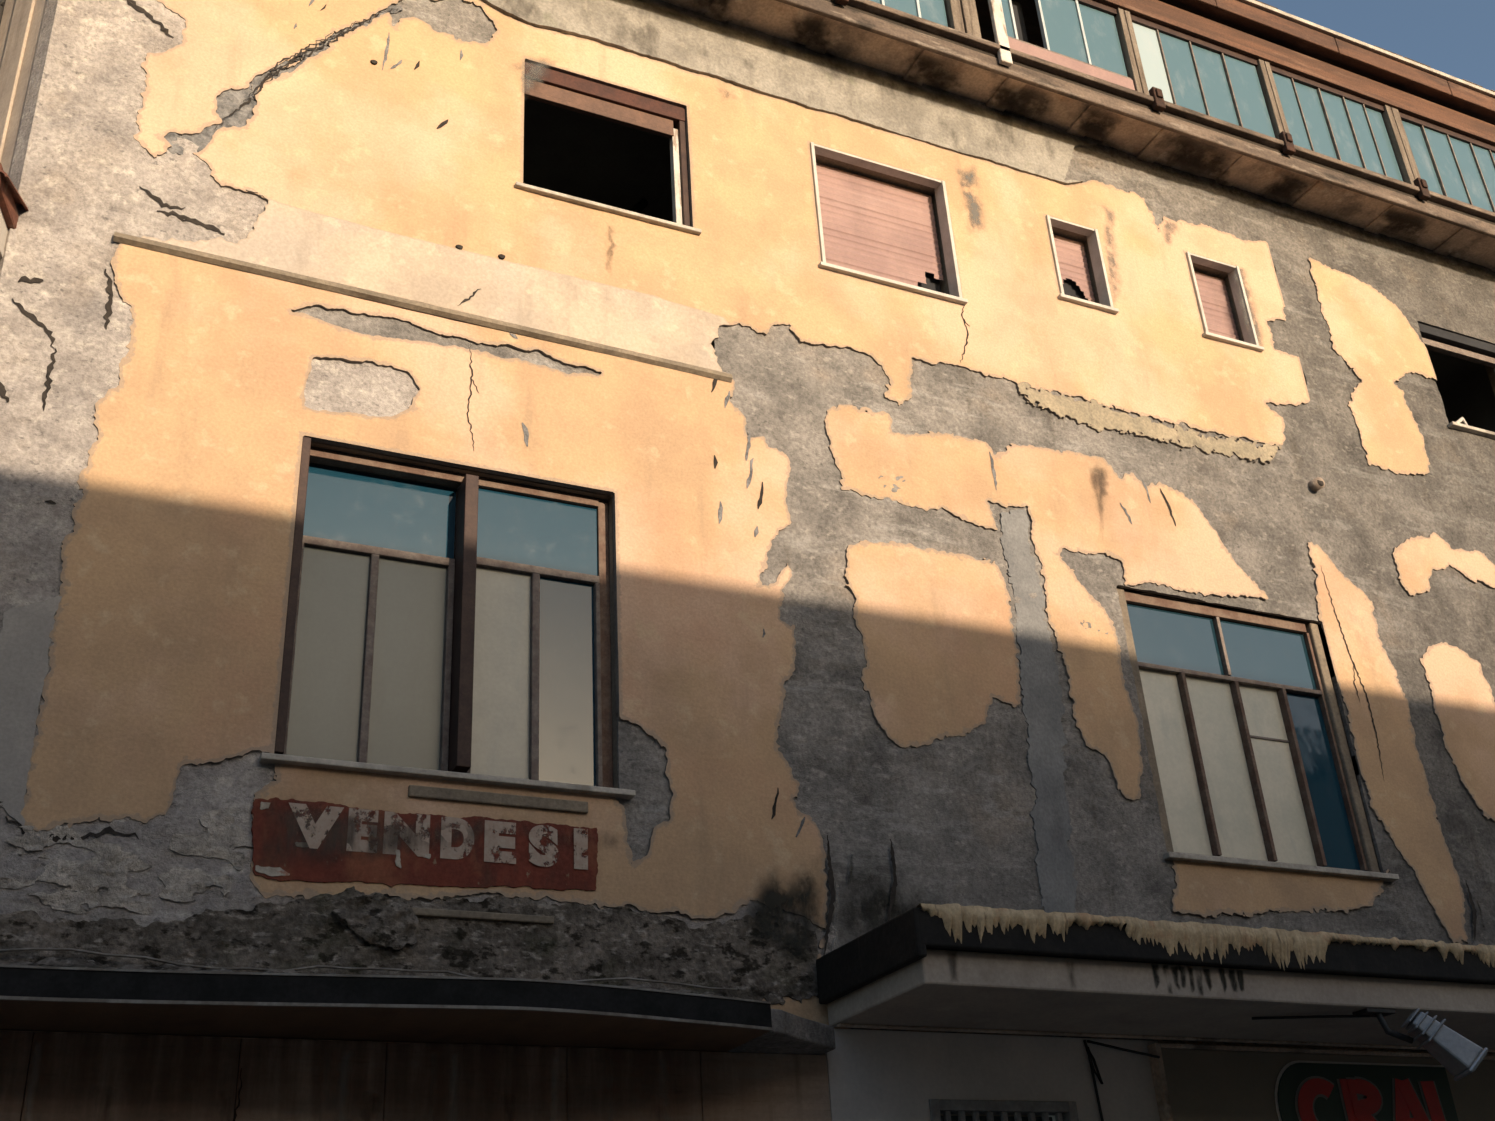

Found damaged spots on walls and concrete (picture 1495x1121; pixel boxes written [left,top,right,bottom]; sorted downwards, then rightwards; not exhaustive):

damp [995,87,1048,115]
damp [1080,113,1118,139]
damp [962,173,981,225]
damp [1268,177,1308,200]
damp [1383,210,1425,234]
spalling [292,307,600,376]
spalling [304,358,419,417]
crack [467,343,479,448]
spalling [0,0,305,927]
spalling [370,0,1495,957]
damp [752,835,1495,994]